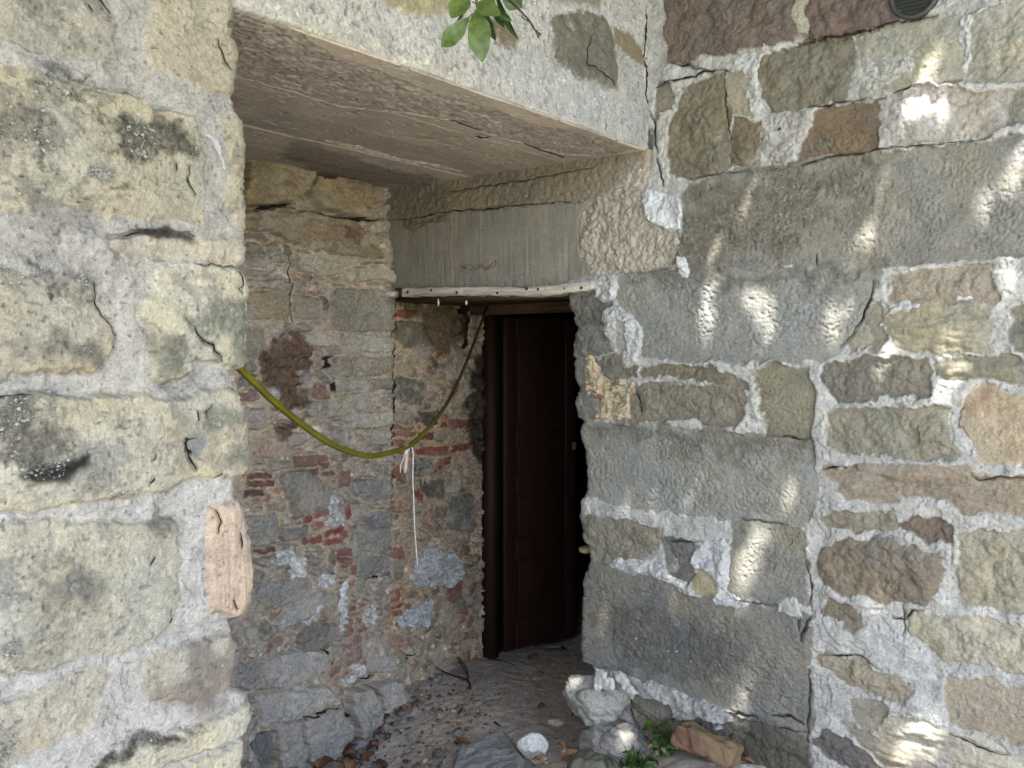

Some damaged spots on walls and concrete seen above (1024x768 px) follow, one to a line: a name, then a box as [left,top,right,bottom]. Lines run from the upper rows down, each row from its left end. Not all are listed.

crack [586,35,617,89]
crack [643,10,732,186]
crack [450,120,491,139]
damp [134,226,192,241]
crack [185,317,222,362]
flaking render [584,354,636,421]
damp [21,455,90,483]